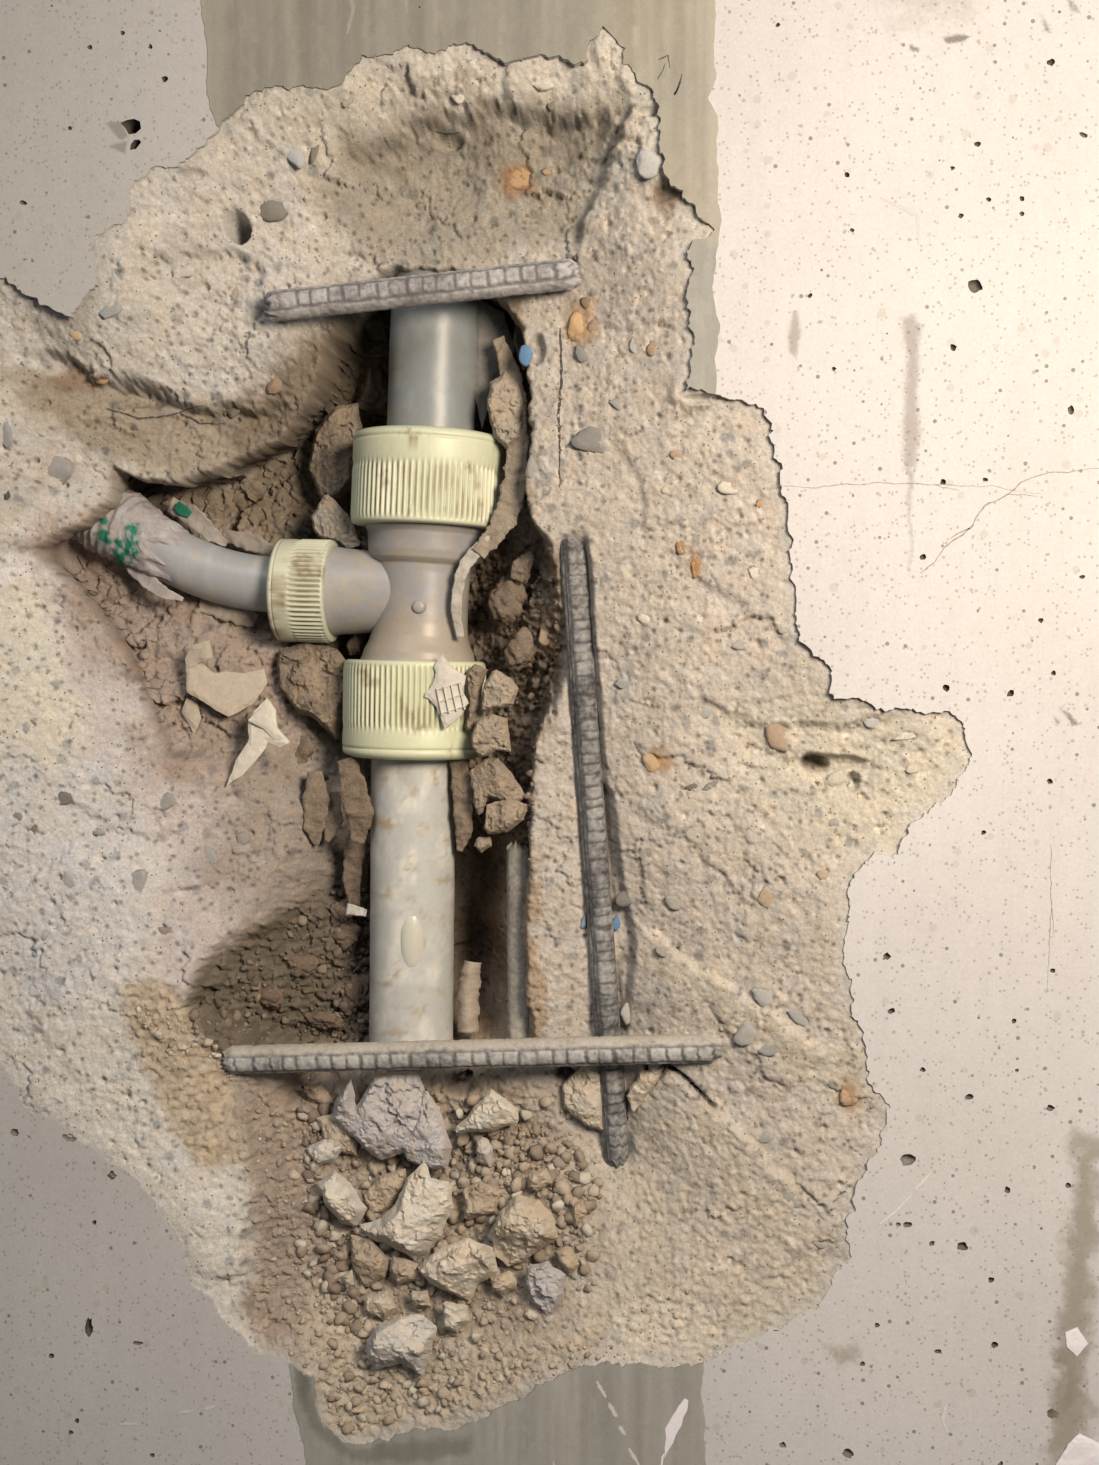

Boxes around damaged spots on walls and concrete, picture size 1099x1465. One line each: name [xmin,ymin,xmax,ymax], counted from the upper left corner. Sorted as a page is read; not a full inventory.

spalling [121,119,141,150]
spalling [262,259,582,322]
spalling [968,280,983,293]
spalling [359,409,387,429]
spalling [475,403,493,435]
spalling [333,488,368,550]
crack [777,468,1099,573]
spalling [765,724,788,752]
spalling [560,538,621,1037]
spalling [222,653,722,1099]
spalling [733,1020,755,1047]
spalling [597,1065,630,1169]